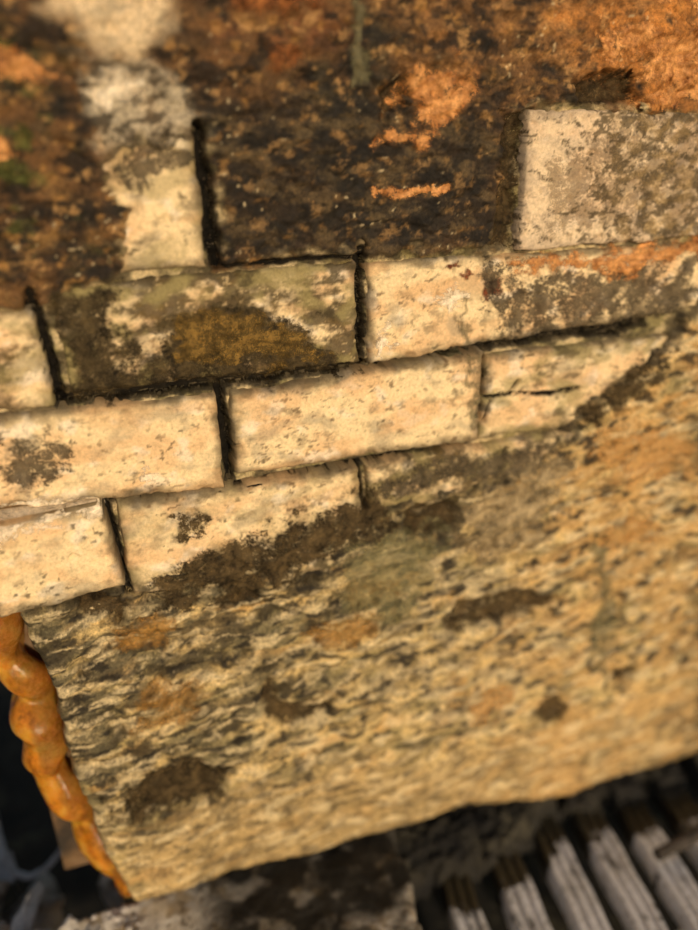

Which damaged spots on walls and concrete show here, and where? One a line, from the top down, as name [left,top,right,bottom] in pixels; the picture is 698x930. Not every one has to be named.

damp [436,322,472,357]
crack [426,318,637,355]
crack [481,374,579,419]
damp [221,459,326,481]
damp [168,512,212,543]